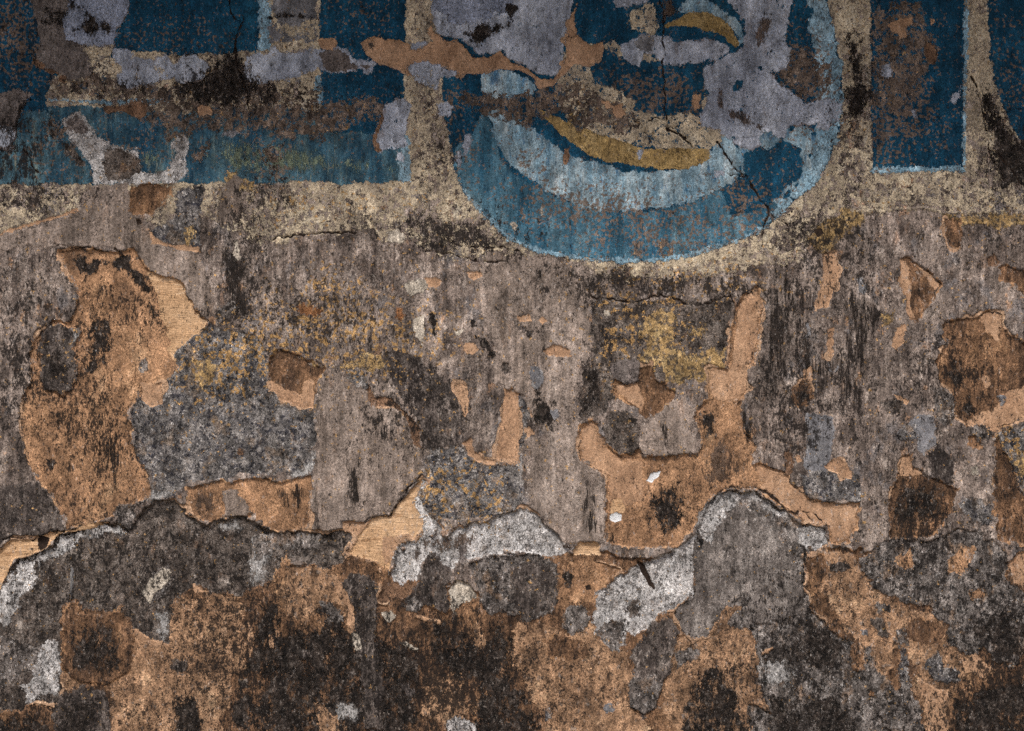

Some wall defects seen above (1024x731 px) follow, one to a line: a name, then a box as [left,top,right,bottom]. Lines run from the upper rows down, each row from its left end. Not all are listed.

peeling [361,3,604,89]
water stain [47,50,385,144]
crack [644,0,789,245]
water stain [980,81,1024,191]
spalling [880,256,943,351]
spalling [931,309,1024,547]
flaking render [0,246,442,713]
flaking render [541,282,962,731]
spalling [449,580,486,650]
spalling [314,701,340,731]
spalling [446,716,477,731]